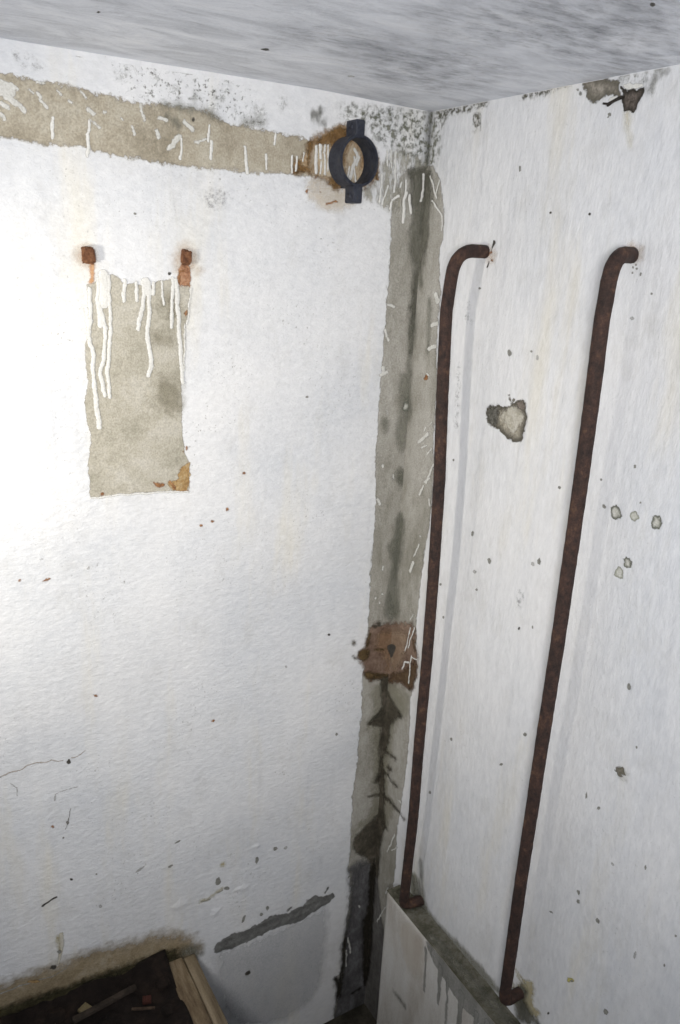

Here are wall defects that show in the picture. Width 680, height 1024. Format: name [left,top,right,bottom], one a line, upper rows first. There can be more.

peeling [0,73,319,177]
rust [292,124,379,209]
spalling [577,78,644,118]
rust [177,264,191,287]
peeling [84,269,192,499]
peeling [365,150,444,649]
spalling [486,395,527,442]
rust [352,614,419,691]
peeling [336,666,521,1024]
spalling [214,887,335,953]
damp [0,933,202,1017]
rust [513,979,539,1024]